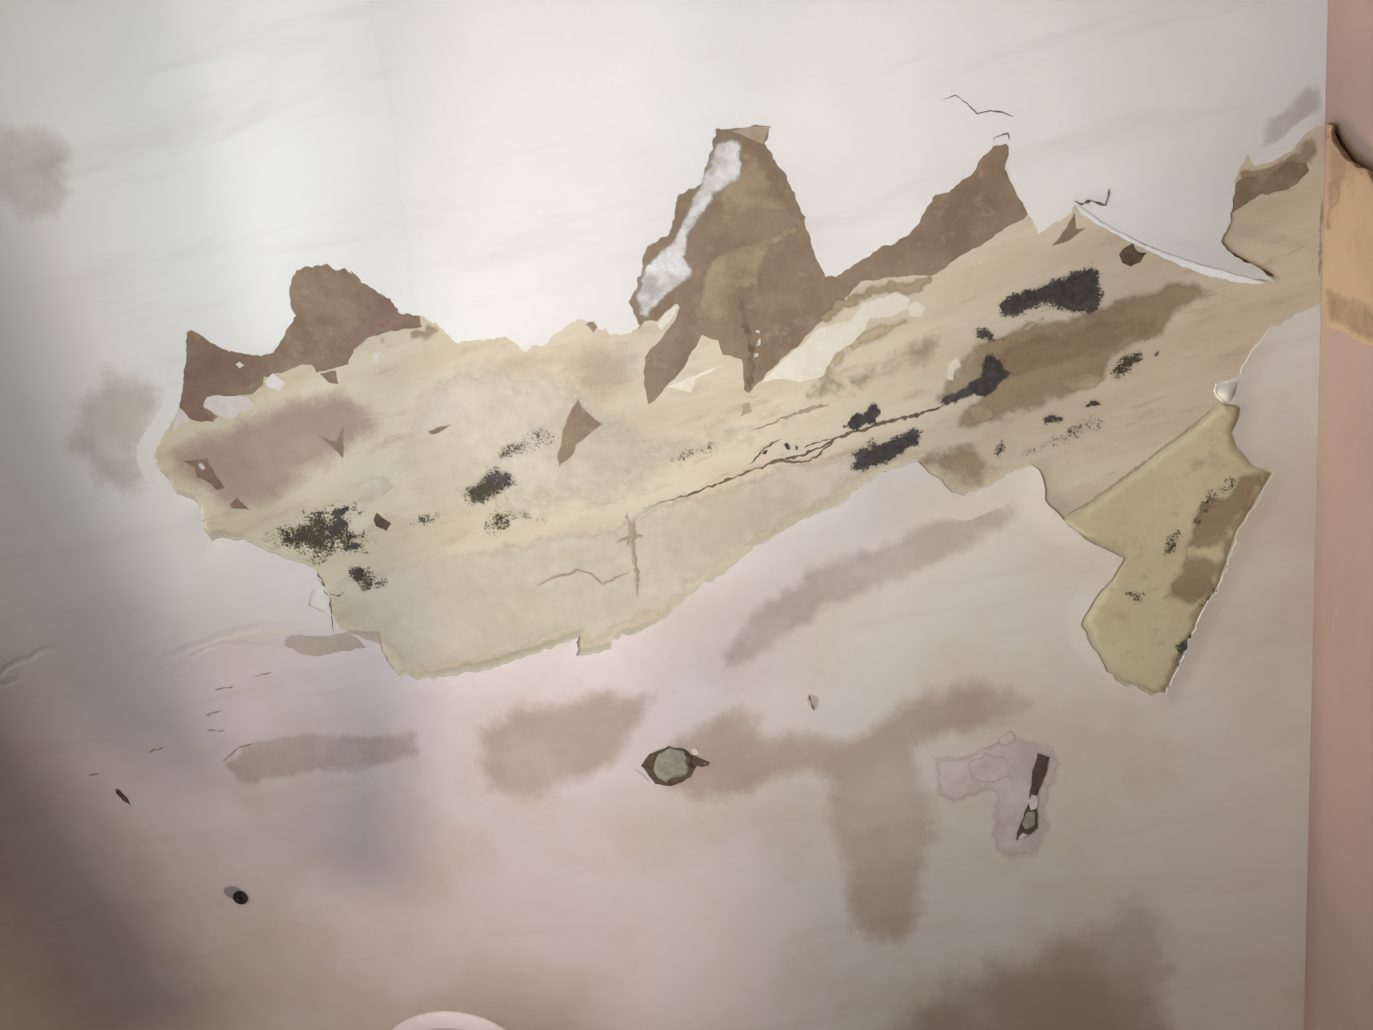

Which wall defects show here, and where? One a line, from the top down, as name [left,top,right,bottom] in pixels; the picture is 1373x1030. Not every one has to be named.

crack [942,95,1013,140]
peeling [133,65,1373,717]
water stain [940,262,1104,405]
water stain [1109,352,1159,379]
crack [538,404,945,596]
water stain [263,503,391,593]
flaking render [635,746,710,786]
flaking render [1016,753,1049,841]